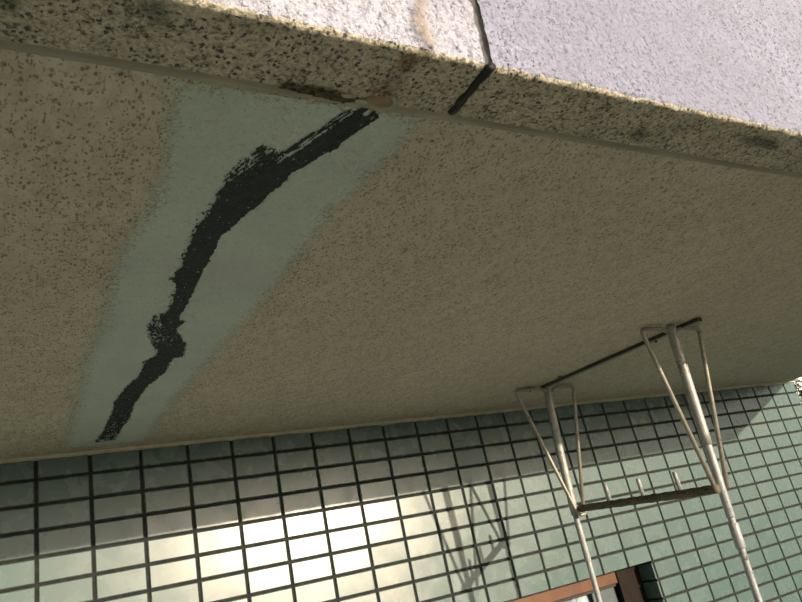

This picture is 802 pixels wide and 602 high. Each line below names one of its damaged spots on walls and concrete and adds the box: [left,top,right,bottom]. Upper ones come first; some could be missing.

crack [95,107,379,443]